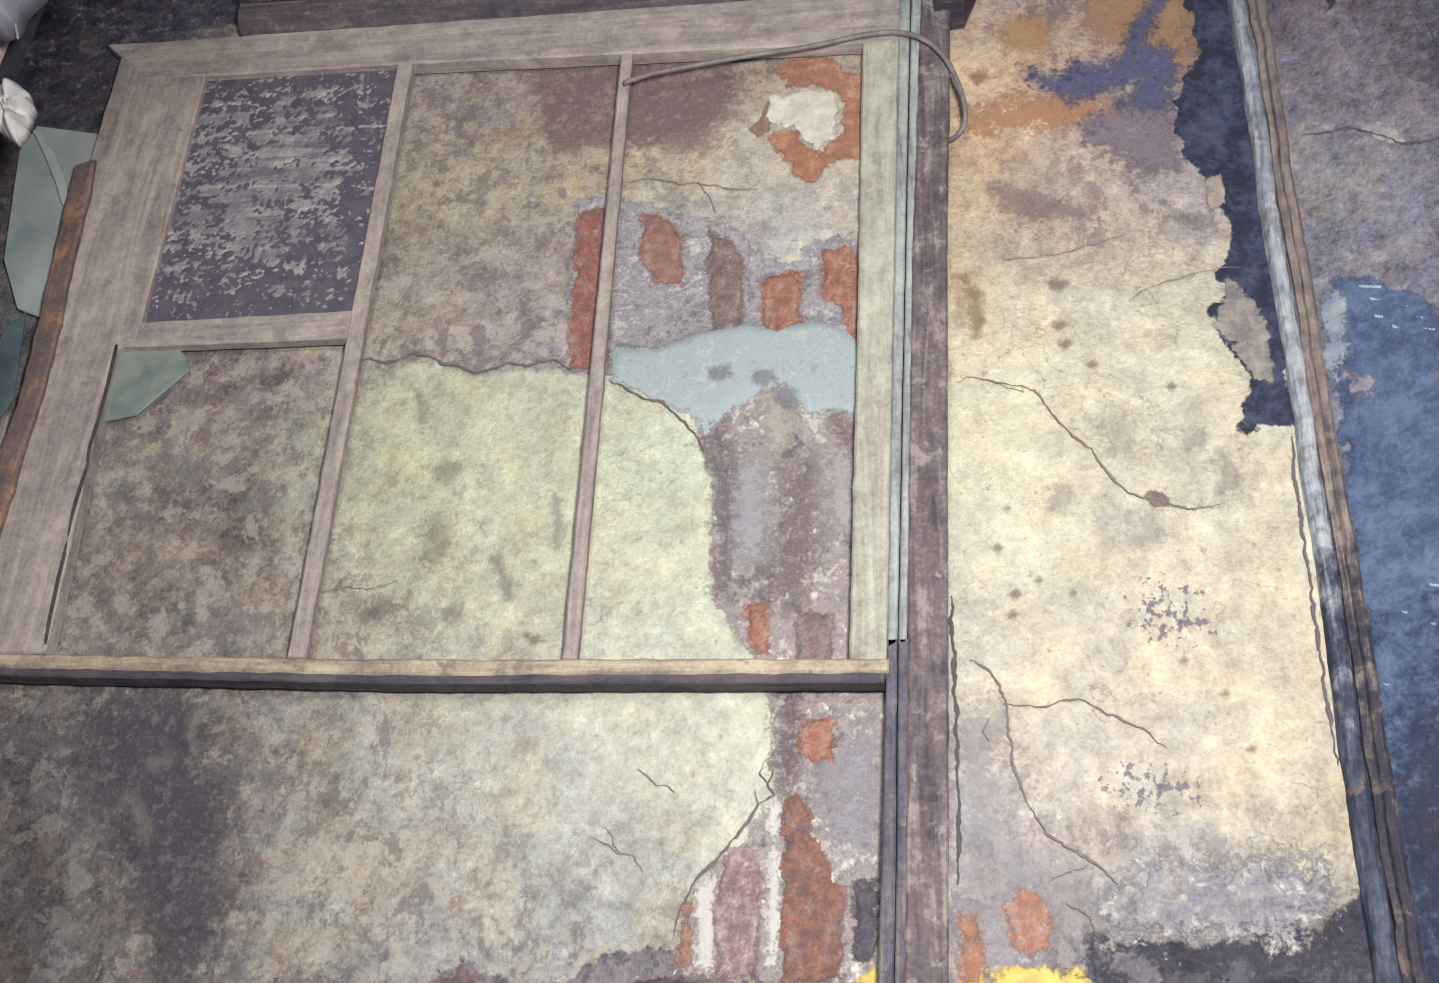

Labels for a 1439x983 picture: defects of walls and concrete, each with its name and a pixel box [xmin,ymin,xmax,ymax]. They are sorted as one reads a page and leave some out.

crack [626,178,751,213]
peeling [749,56,862,182]
crack [1303,126,1439,144]
spalling [558,193,859,376]
crack [363,350,572,373]
crack [959,376,1219,510]
spalling [698,371,855,660]
crack [673,752,775,939]
spalling [555,684,898,983]
crack [948,596,1167,937]
spalling [428,959,507,983]
spalling [949,880,1059,983]